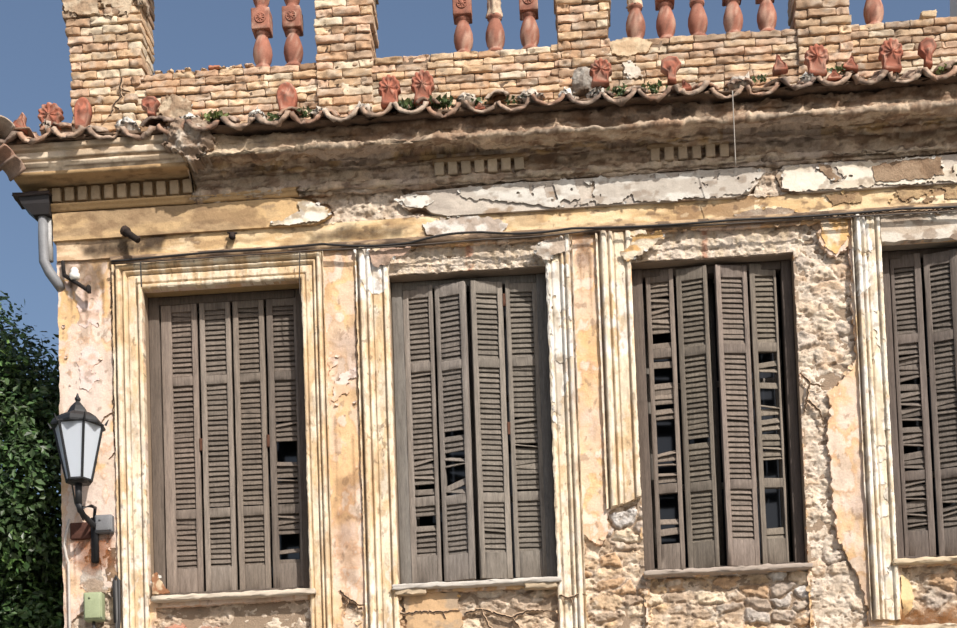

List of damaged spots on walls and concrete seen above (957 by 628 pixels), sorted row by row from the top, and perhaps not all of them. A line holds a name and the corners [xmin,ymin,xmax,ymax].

water stain [589,105,711,120]
flaking render [270,190,577,426]
flaking render [457,156,957,628]
crack [800,372,824,425]
peeling [151,572,170,595]
flaking render [153,600,311,628]
flaking render [340,597,363,626]
flaking render [399,596,407,628]
crack [401,593,586,628]